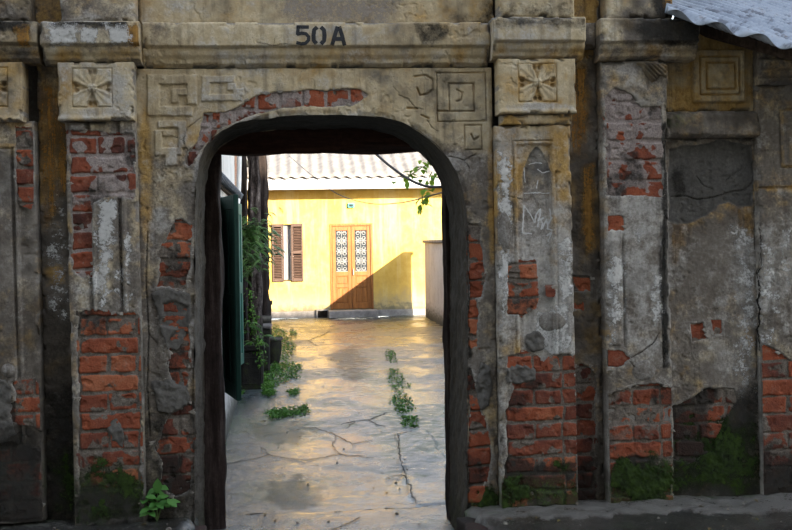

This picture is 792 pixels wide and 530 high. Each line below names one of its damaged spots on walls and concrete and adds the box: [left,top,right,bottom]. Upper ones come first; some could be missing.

flaking render [66,129,136,278]
flaking render [157,219,194,292]
flaking render [186,87,367,166]
flaking render [504,259,559,318]
flaking render [601,88,665,200]
water stain [0,386,144,527]
flaking render [73,302,197,525]
crack [227,412,428,507]
flaking render [502,350,598,508]
flaking render [608,383,737,503]
water stain [672,225,792,497]
flaking render [761,344,792,495]